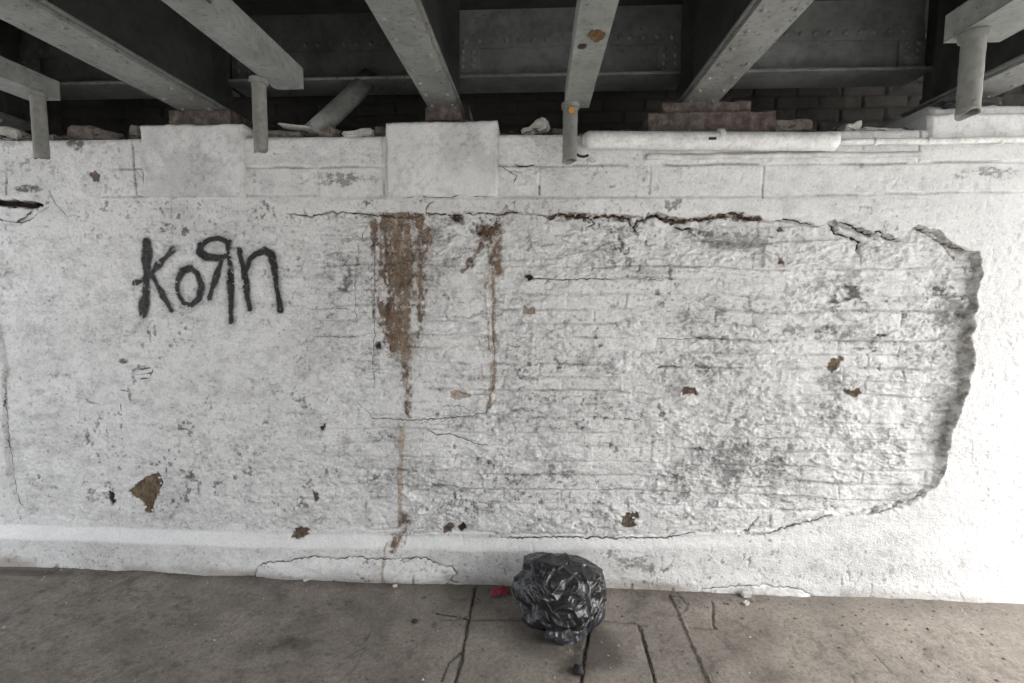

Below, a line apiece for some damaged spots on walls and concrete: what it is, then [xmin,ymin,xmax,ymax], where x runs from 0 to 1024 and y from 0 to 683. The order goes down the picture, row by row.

rust [578,30,605,49]
crack [547,212,966,258]
rust [370,212,433,583]
rust [453,214,508,409]
flaking render [312,209,984,540]
peeling [291,526,310,539]
crack [261,555,476,683]